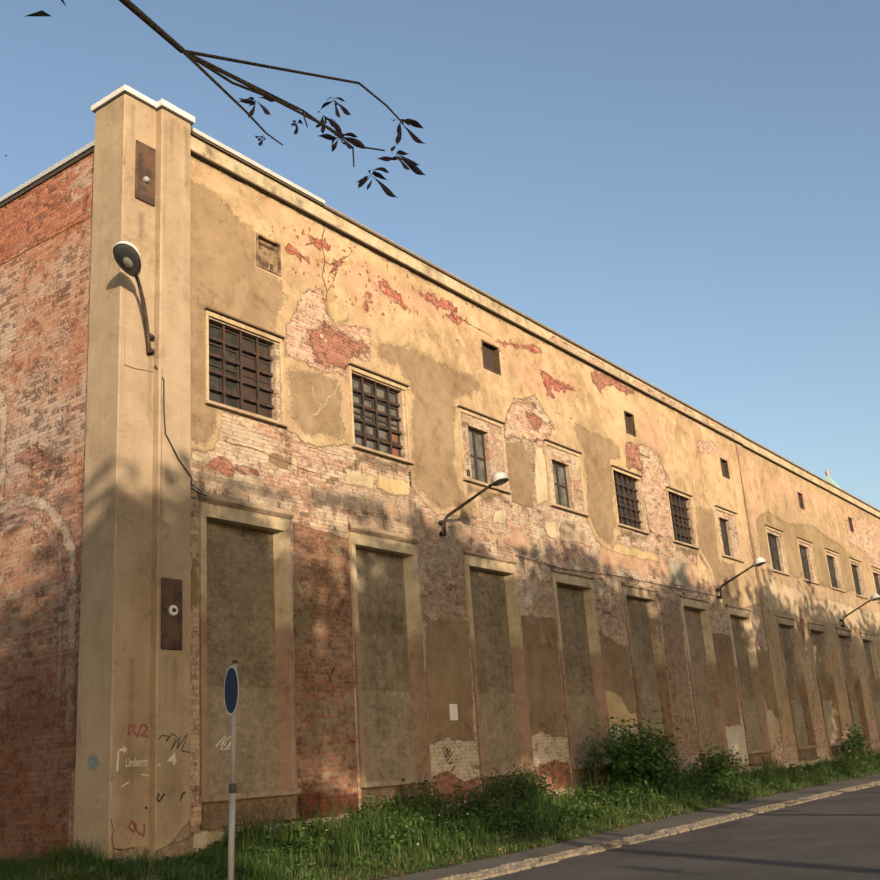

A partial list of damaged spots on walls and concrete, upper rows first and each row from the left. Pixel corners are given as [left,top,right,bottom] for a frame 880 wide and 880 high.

crack [305,225,349,312]
spalling [284,223,475,377]
crack [309,367,346,431]
spalling [495,336,693,446]
spalling [203,456,260,478]
spalling [354,459,410,482]
spalling [625,441,673,540]
peeling [429,737,481,806]
peeling [532,732,572,791]